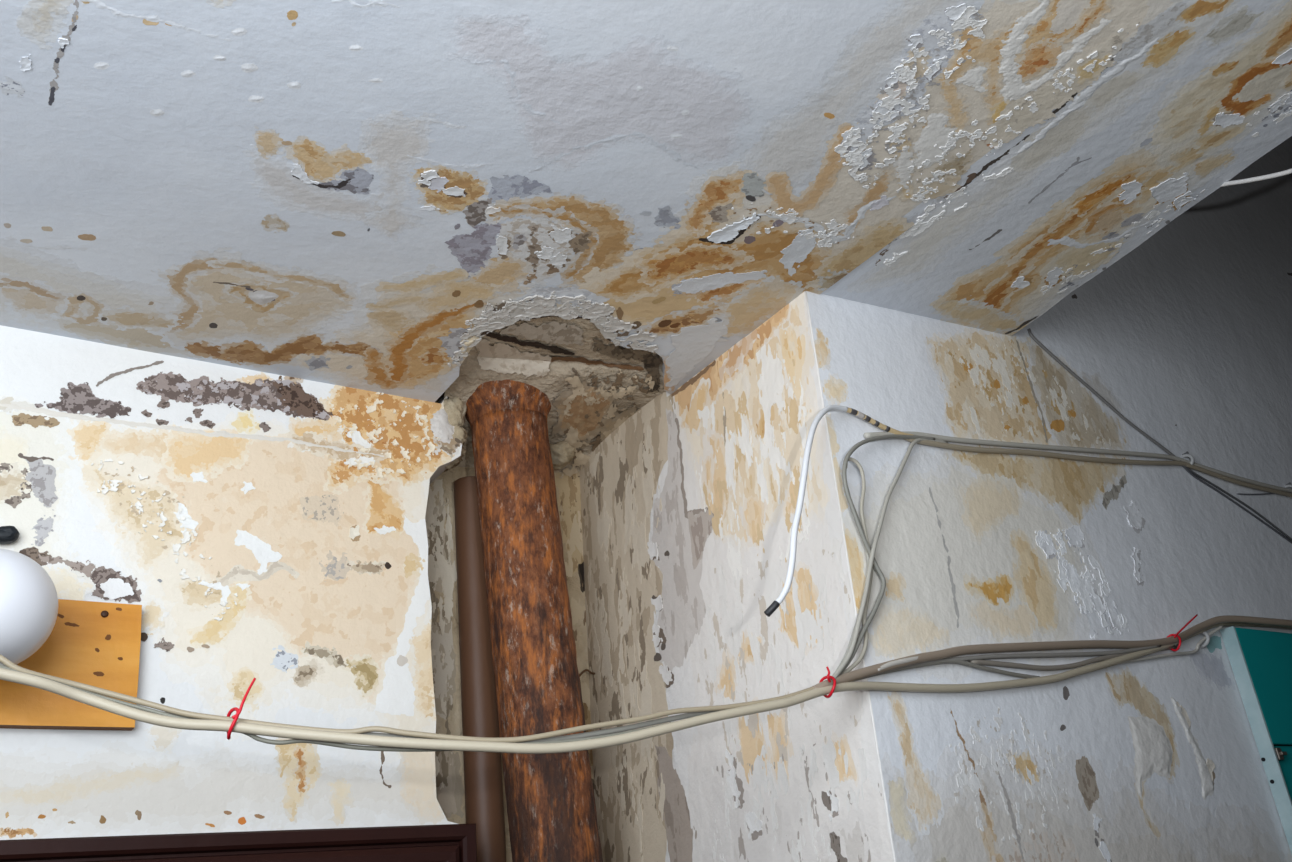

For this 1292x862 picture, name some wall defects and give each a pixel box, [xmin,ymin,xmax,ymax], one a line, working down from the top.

crack [48,0,79,105]
water stain [242,110,440,242]
peeling [834,2,1186,267]
water stain [0,223,536,733]
flaking render [0,170,884,862]
water stain [444,0,1292,862]
water stain [0,724,465,840]